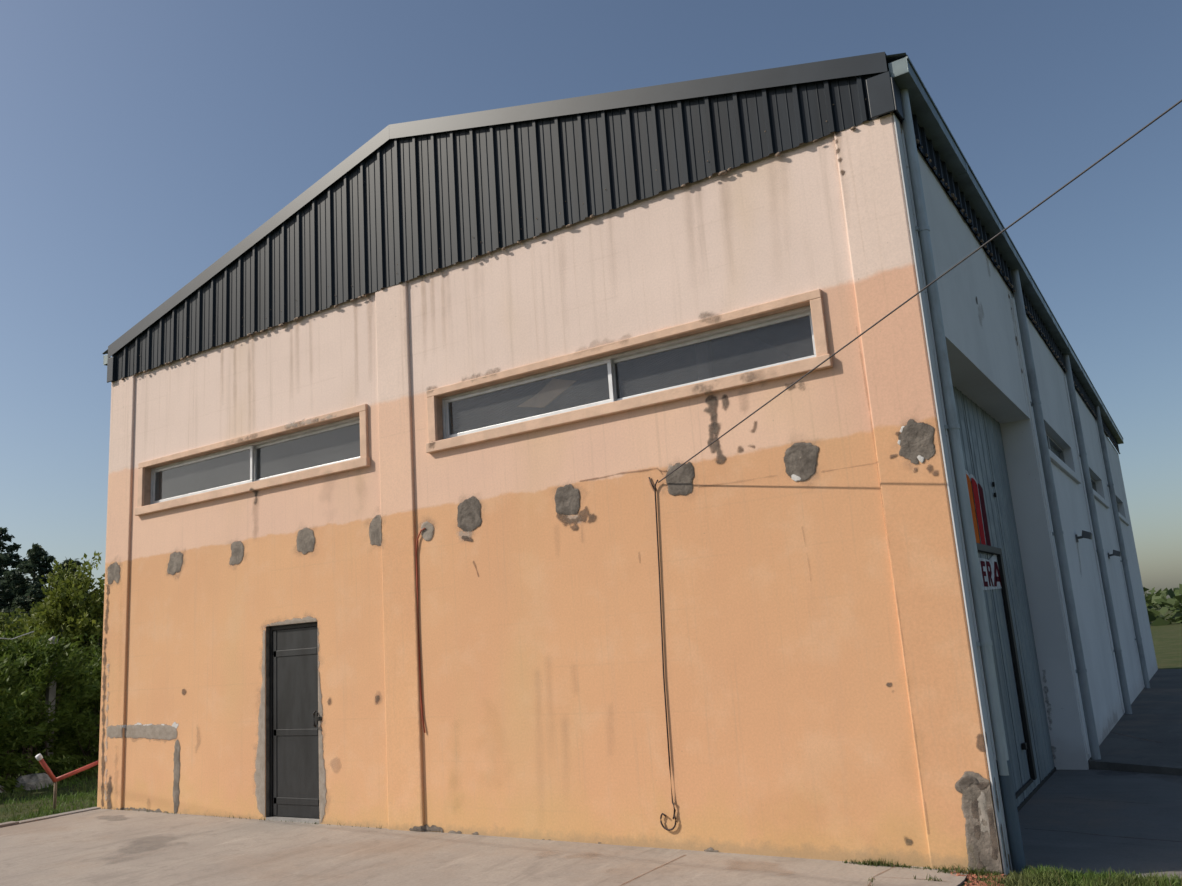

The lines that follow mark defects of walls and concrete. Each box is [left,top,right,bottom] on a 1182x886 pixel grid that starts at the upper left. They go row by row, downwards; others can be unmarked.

peeling [101,585,166,813]
spalling [955,771,1008,873]